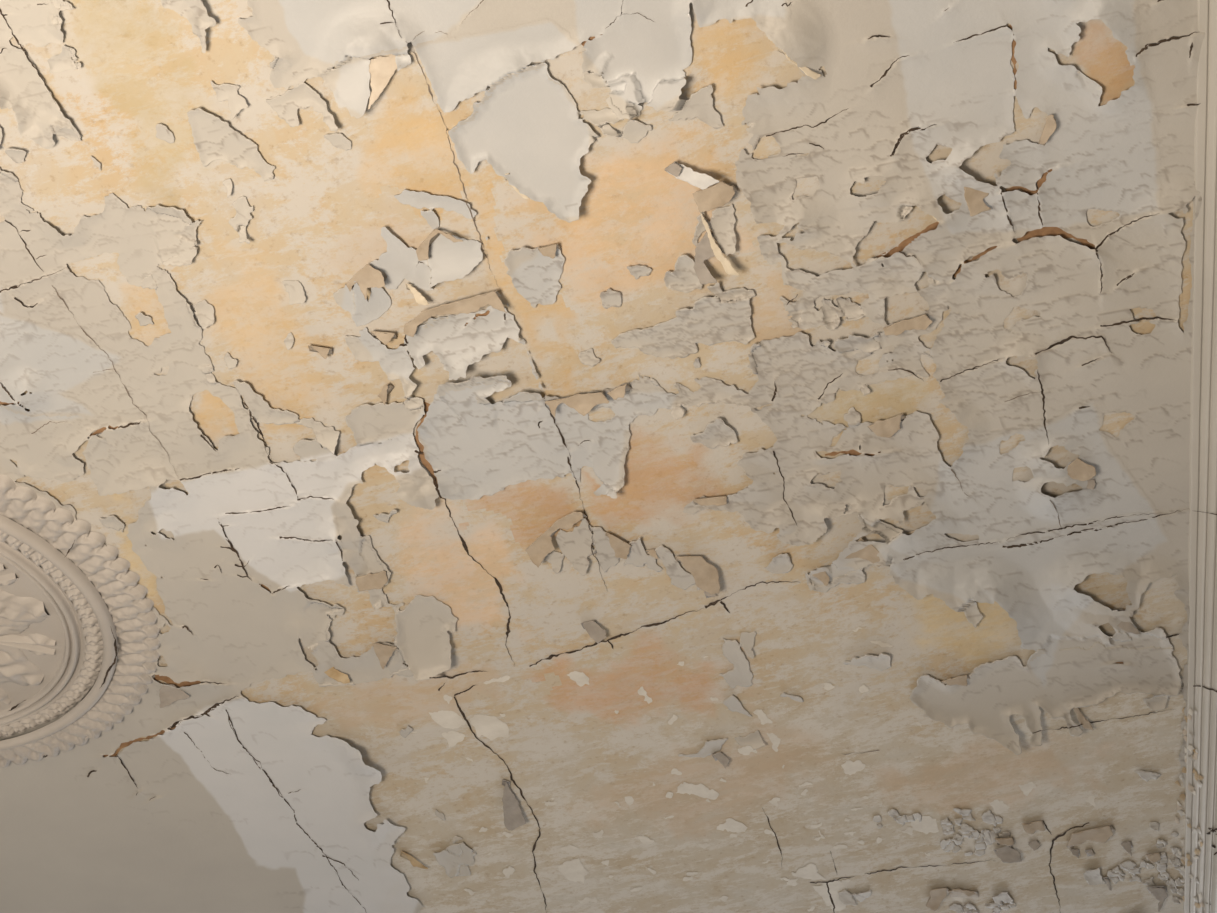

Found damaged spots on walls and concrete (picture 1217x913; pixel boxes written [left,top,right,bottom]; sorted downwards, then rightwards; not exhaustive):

peeling [10,428,217,708]
crack [0,220,239,481]
damp [107,492,163,609]
crack [87,675,366,911]
crack [204,402,343,594]
peeling [0,0,551,463]
damp [48,0,818,447]
crack [414,400,792,913]
peeling [230,44,1204,913]
damp [304,417,1142,849]
damp [801,372,945,439]
crack [953,169,1157,294]